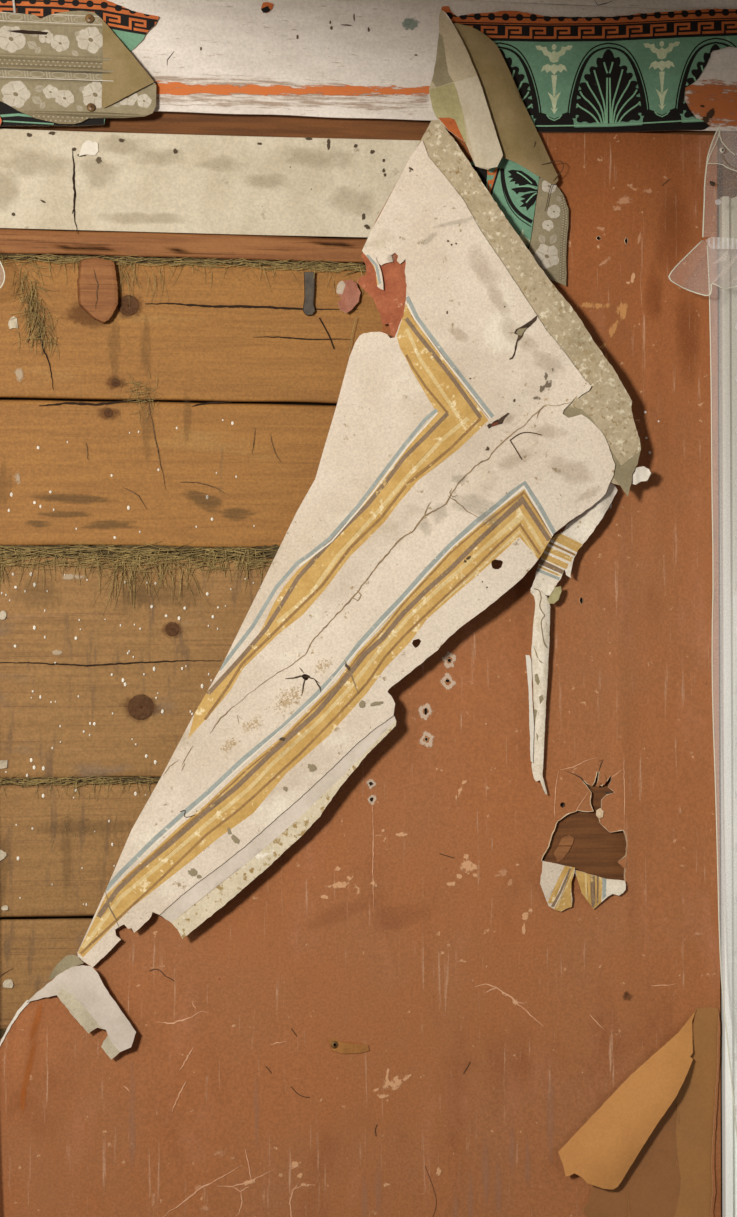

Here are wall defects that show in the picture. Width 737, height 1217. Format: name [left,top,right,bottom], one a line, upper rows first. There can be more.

peeling [261,2,273,13]
peeling [685,80,737,127]
crack [72,140,98,228]
crack [145,303,358,340]
crack [27,309,231,508]
peeling [77,10,652,967]
crack [164,402,571,774]